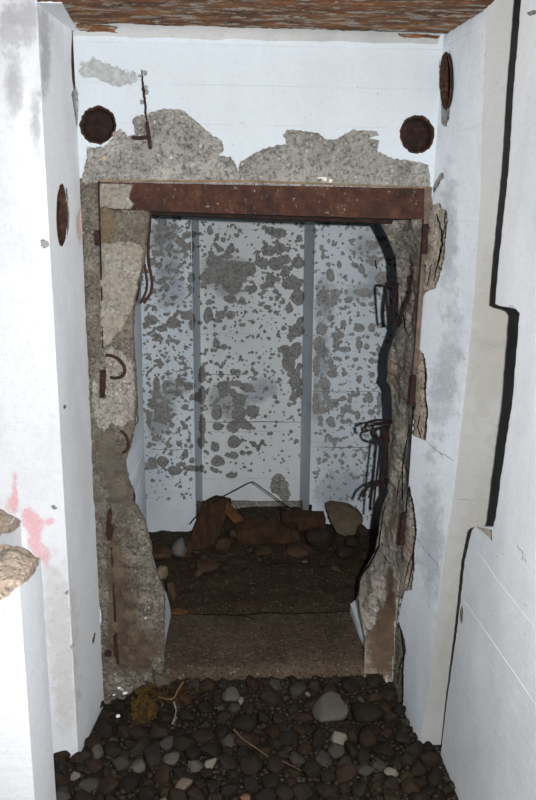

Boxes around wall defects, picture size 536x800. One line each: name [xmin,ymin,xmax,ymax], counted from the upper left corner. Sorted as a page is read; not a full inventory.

spalling [80,108,448,705]